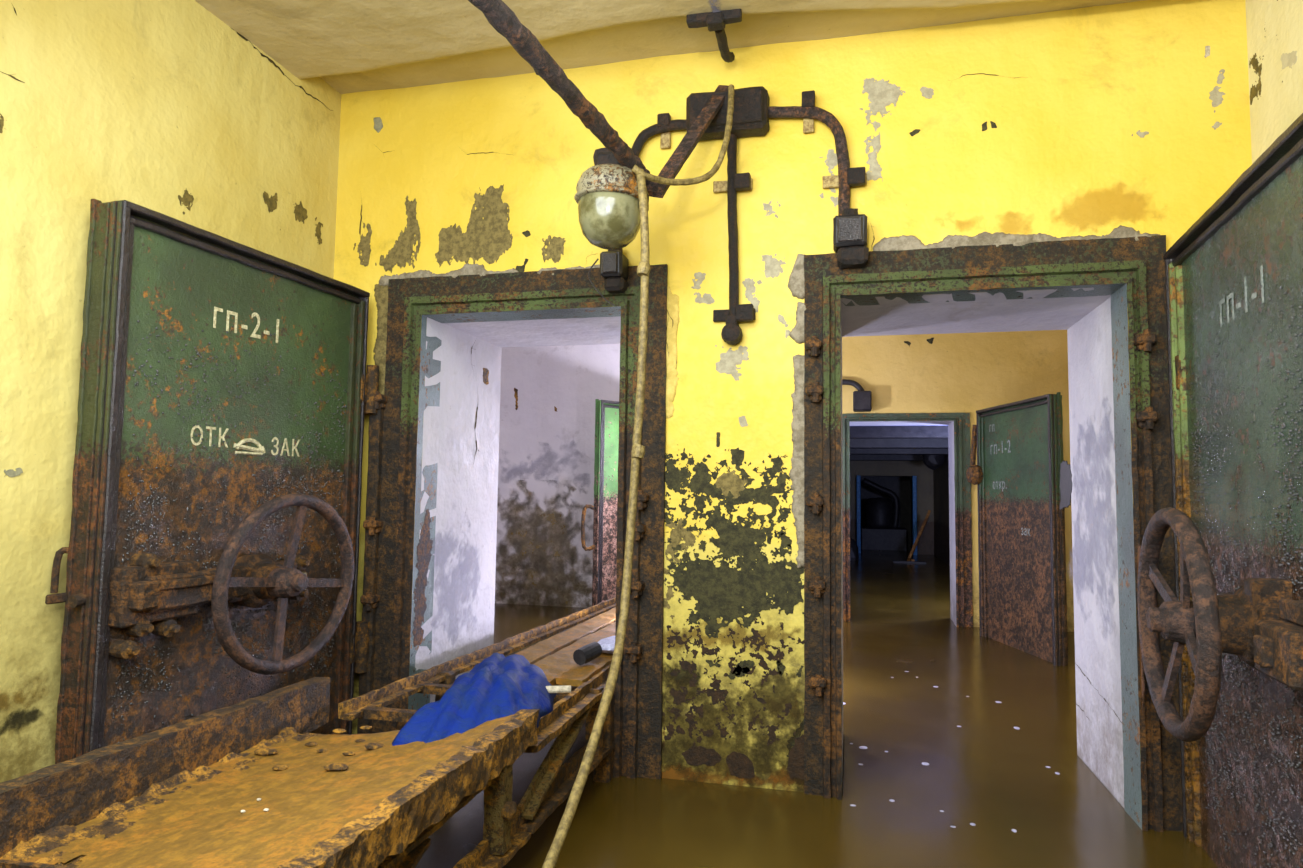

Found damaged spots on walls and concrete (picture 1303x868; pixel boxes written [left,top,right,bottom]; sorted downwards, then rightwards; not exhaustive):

peeling [860,78,934,182]
peeling [353,184,600,395]
peeling [4,467,23,477]
damp [496,481,593,608]
damp [663,624,798,651]
damp [0,693,42,734]
damp [662,665,804,792]